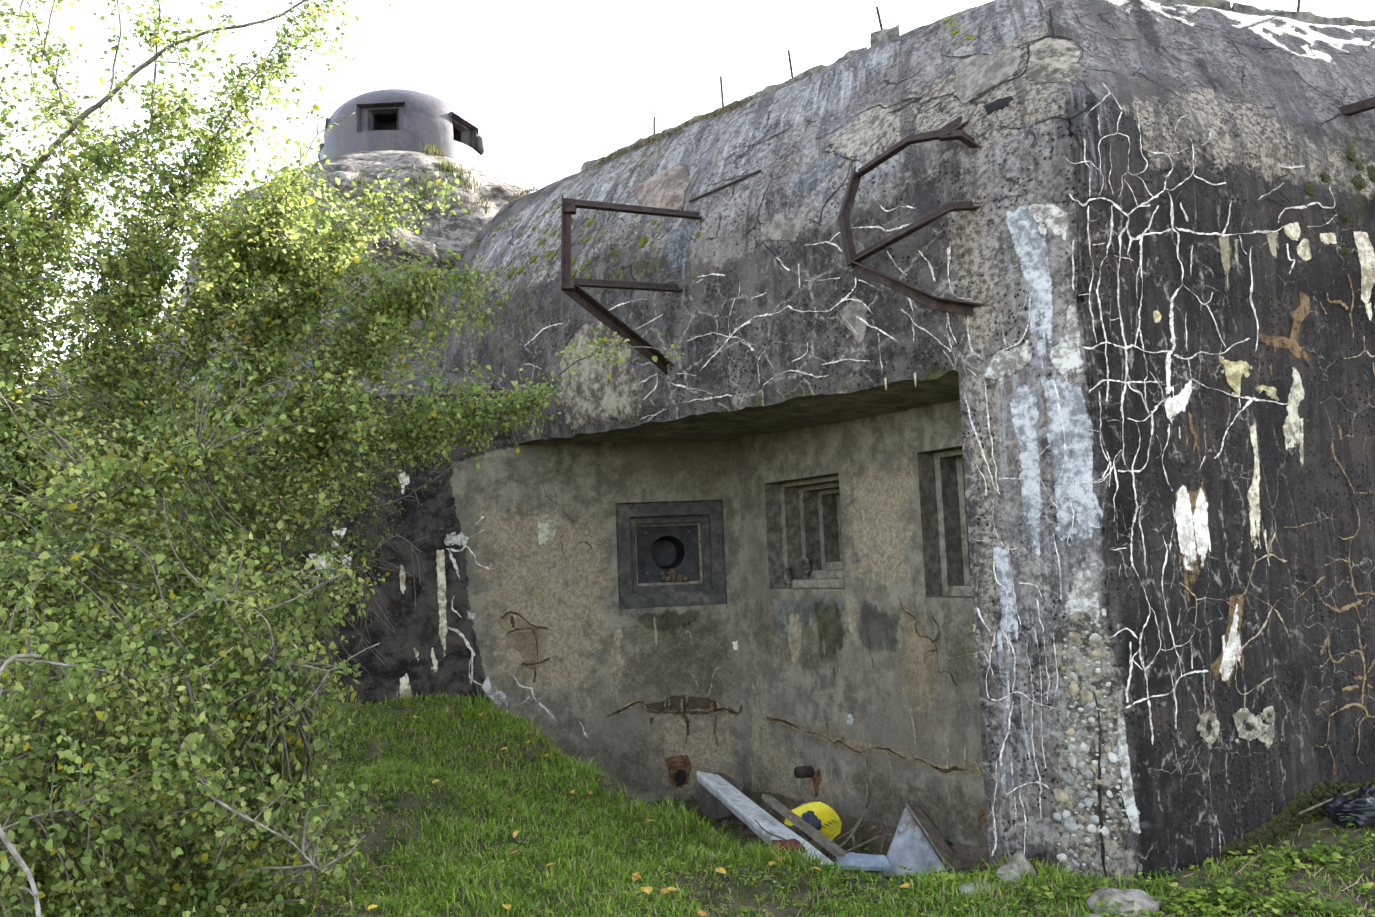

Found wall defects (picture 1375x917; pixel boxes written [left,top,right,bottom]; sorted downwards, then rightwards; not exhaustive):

water stain [1219,236,1238,287]
water stain [1267,222,1337,261]
water stain [1354,231,1375,320]
crack [445,5,1375,878]
water stain [984,204,1103,599]
water stain [1165,358,1194,438]
water stain [1283,367,1305,464]
water stain [1174,485,1211,570]
water stain [1247,423,1269,563]
rust [500,611,546,693]
water stain [993,547,1019,711]
water stain [1219,604,1242,681]